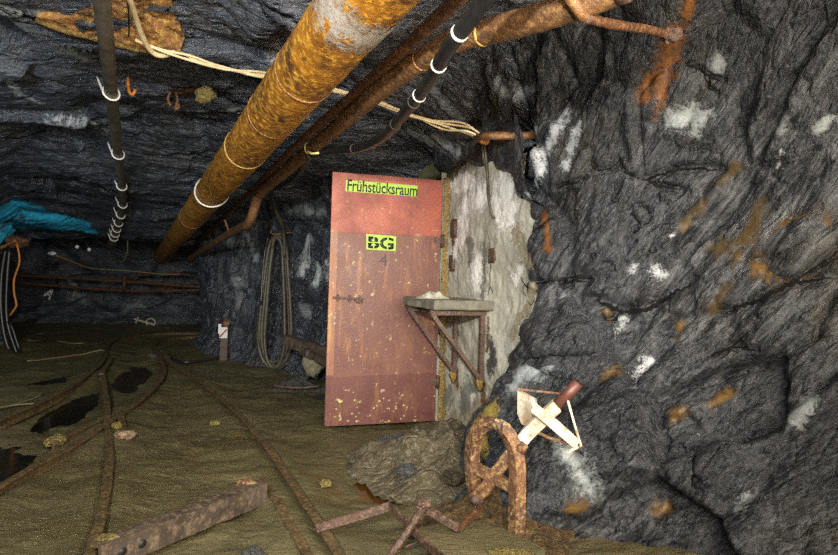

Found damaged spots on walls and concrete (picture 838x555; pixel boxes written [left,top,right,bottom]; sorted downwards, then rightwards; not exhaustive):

leakage [494,77,530,102]
leakage [406,101,582,299]
leakage [506,365,553,393]
leakage [553,436,605,513]